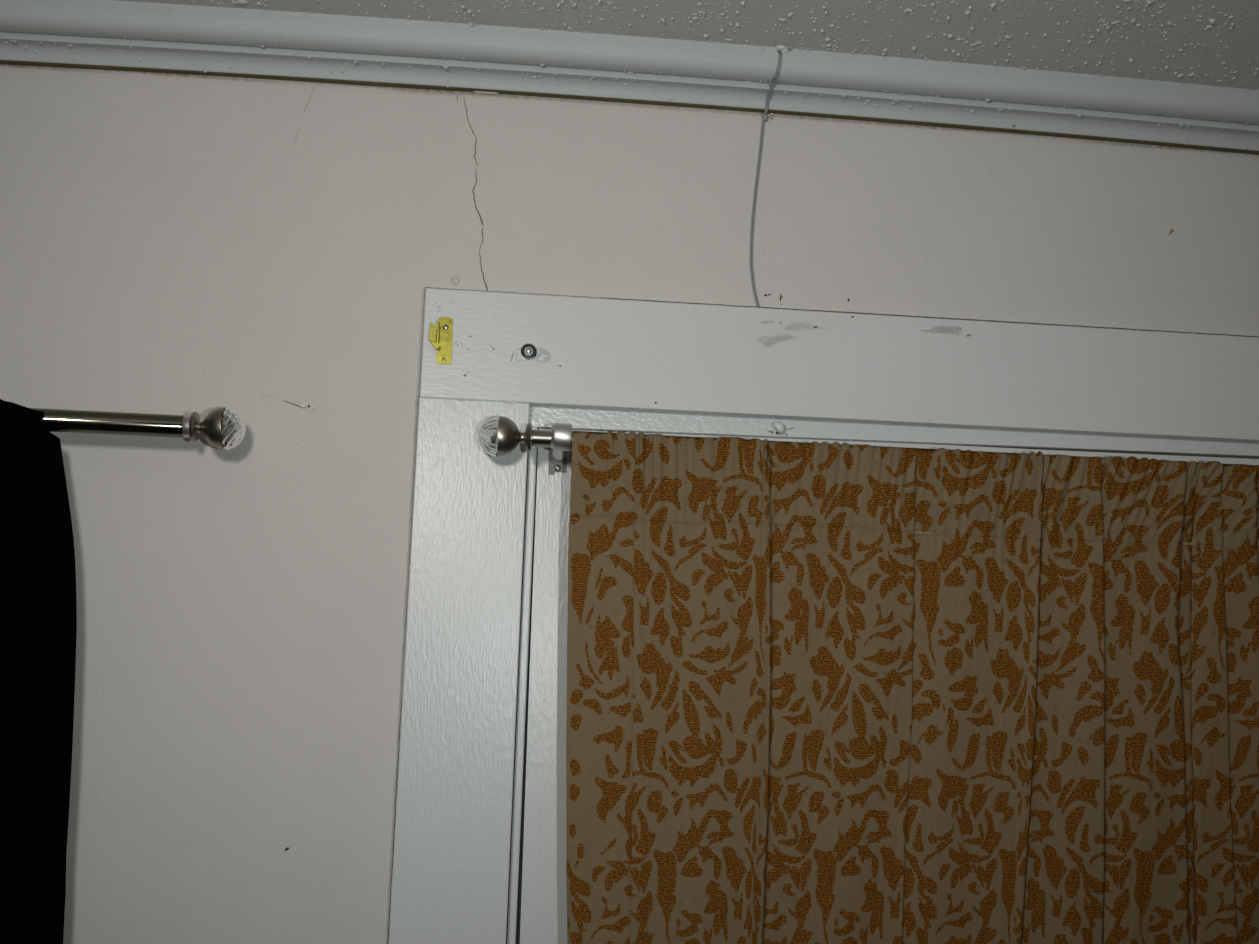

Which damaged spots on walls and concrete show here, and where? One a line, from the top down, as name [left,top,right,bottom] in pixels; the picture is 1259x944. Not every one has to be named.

crack [387,95,1259,944]